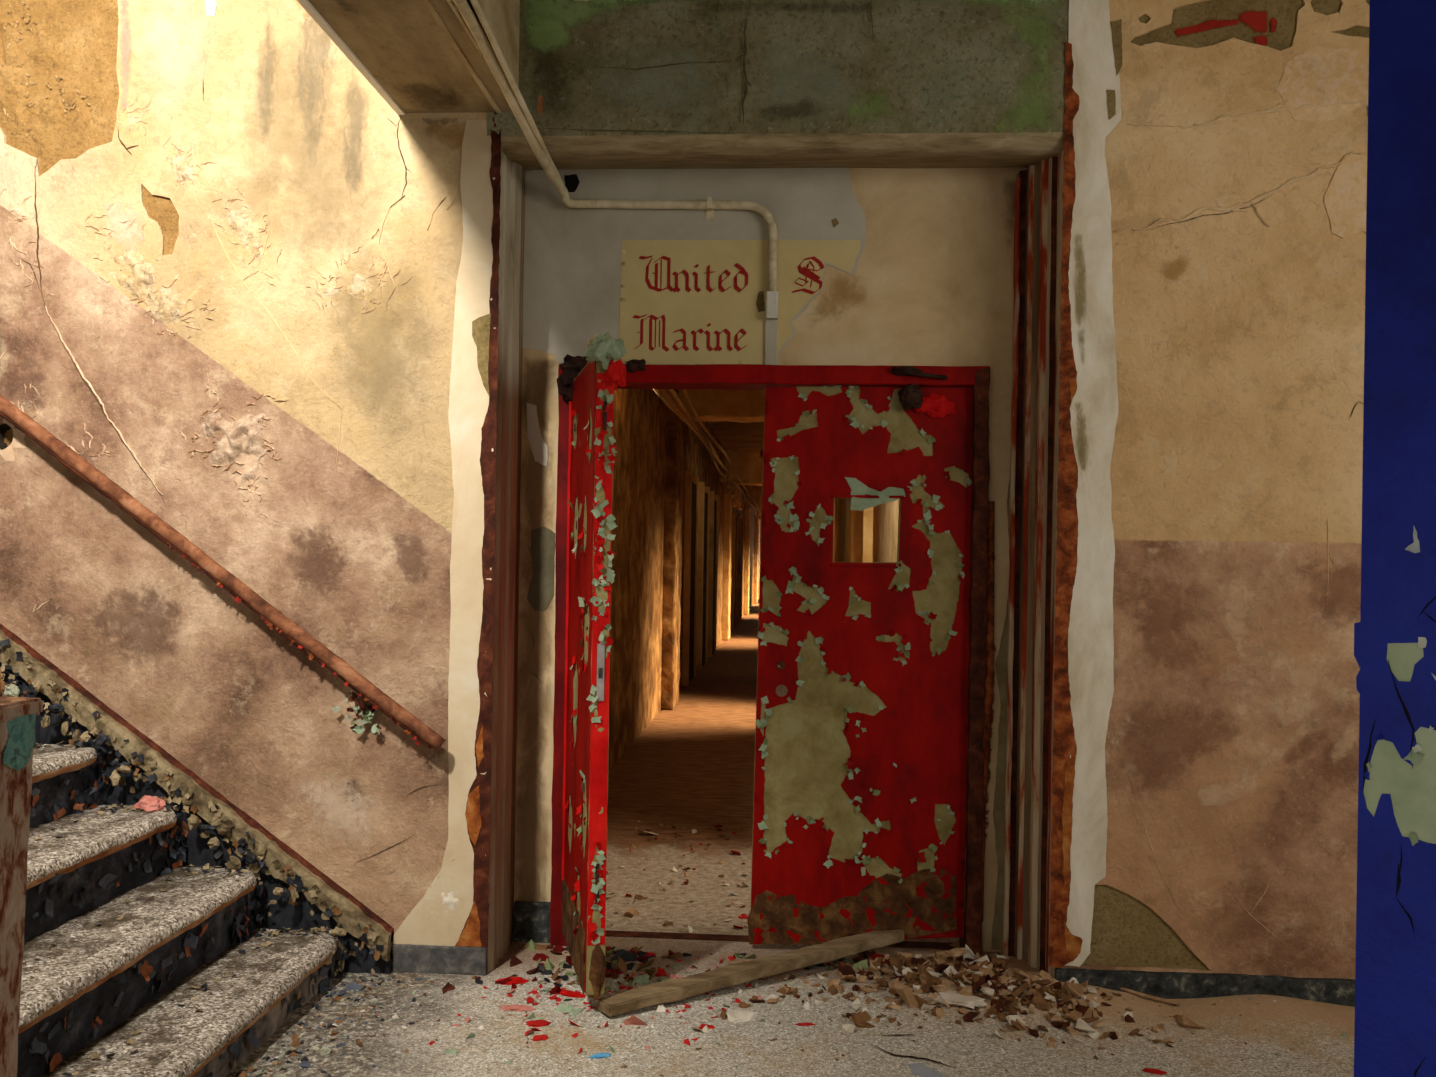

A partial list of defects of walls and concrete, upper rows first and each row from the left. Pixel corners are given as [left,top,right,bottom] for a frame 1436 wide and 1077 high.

flaking render [0,0,119,176]
crack [19,159,167,509]
peeling [522,168,866,365]
crack [1116,151,1367,232]
flaking render [0,120,495,1039]
peeling [527,383,618,748]
peeling [768,385,903,543]
rust [1048,41,1083,968]
flaking render [1064,0,1369,970]
peeling [1387,637,1427,682]
peeling [563,770,607,945]
peeling [1363,726,1436,846]